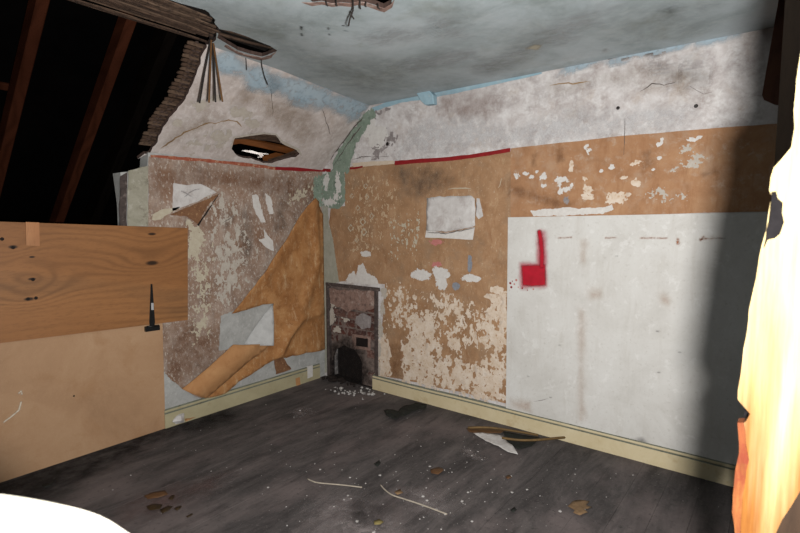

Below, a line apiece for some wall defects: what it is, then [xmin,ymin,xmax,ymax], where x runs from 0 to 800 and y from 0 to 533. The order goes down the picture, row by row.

crack [162,119,242,148]
peeling [670,136,708,172]
peeling [514,157,688,216]
peeling [152,183,274,351]
peeling [230,107,507,406]